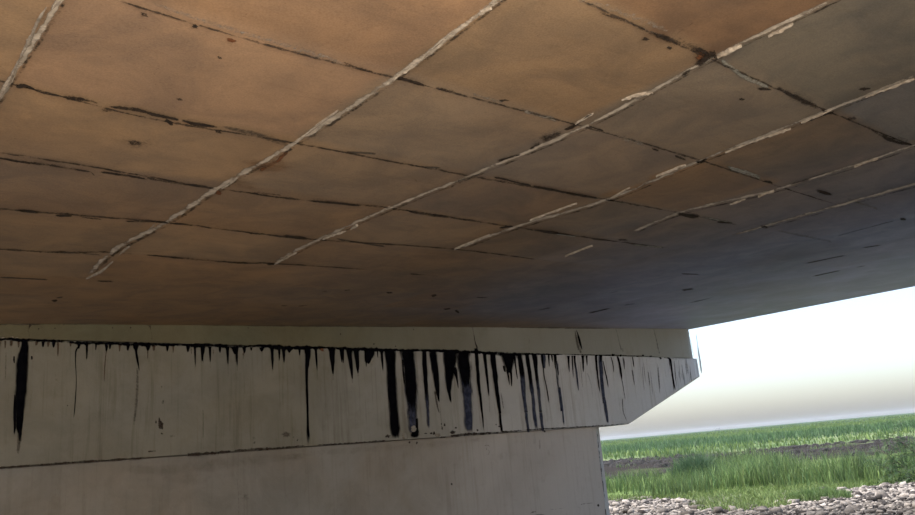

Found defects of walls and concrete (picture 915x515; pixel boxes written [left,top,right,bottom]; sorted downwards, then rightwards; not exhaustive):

water stain [0,336,702,451]